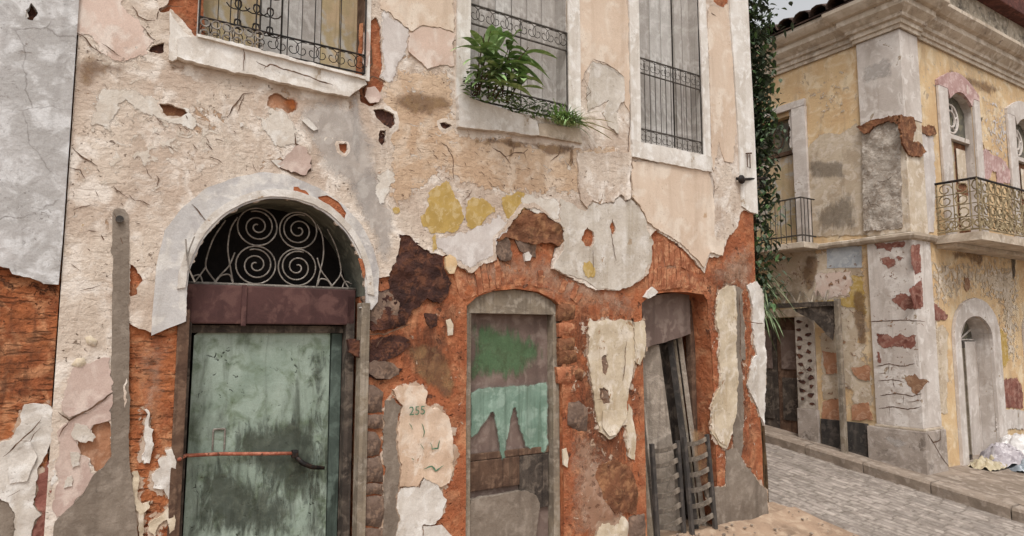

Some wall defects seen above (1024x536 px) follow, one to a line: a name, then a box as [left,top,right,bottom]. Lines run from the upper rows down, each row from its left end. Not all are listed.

flaking render [77,0,346,219]
water stain [401,95,448,112]
spalling [346,0,1024,536]
spalling [0,267,114,536]
spalling [129,323,178,536]
crack [879,363,919,410]